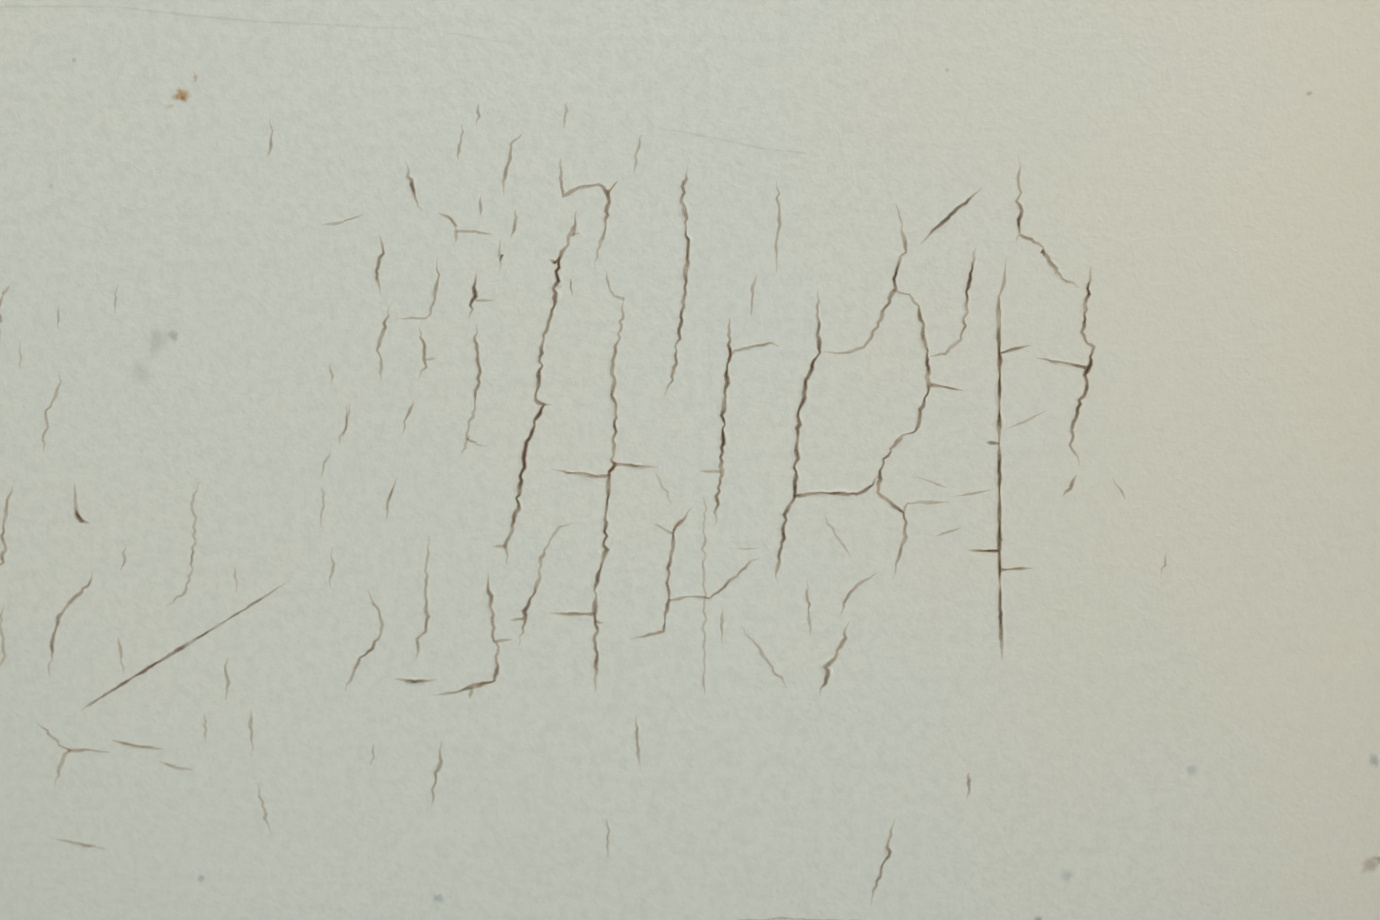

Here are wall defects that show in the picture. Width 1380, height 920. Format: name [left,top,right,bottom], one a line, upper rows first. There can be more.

crack [404,175,418,199]
crack [372,251,387,280]
crack [428,275,484,400]
crack [505,183,613,545]
crack [662,178,971,632]
crack [960,187,1094,642]
crack [0,505,11,575]
crack [402,334,642,692]
crack [47,582,90,653]
crack [350,641,375,677]
crack [804,580,862,686]
crack [64,740,152,754]